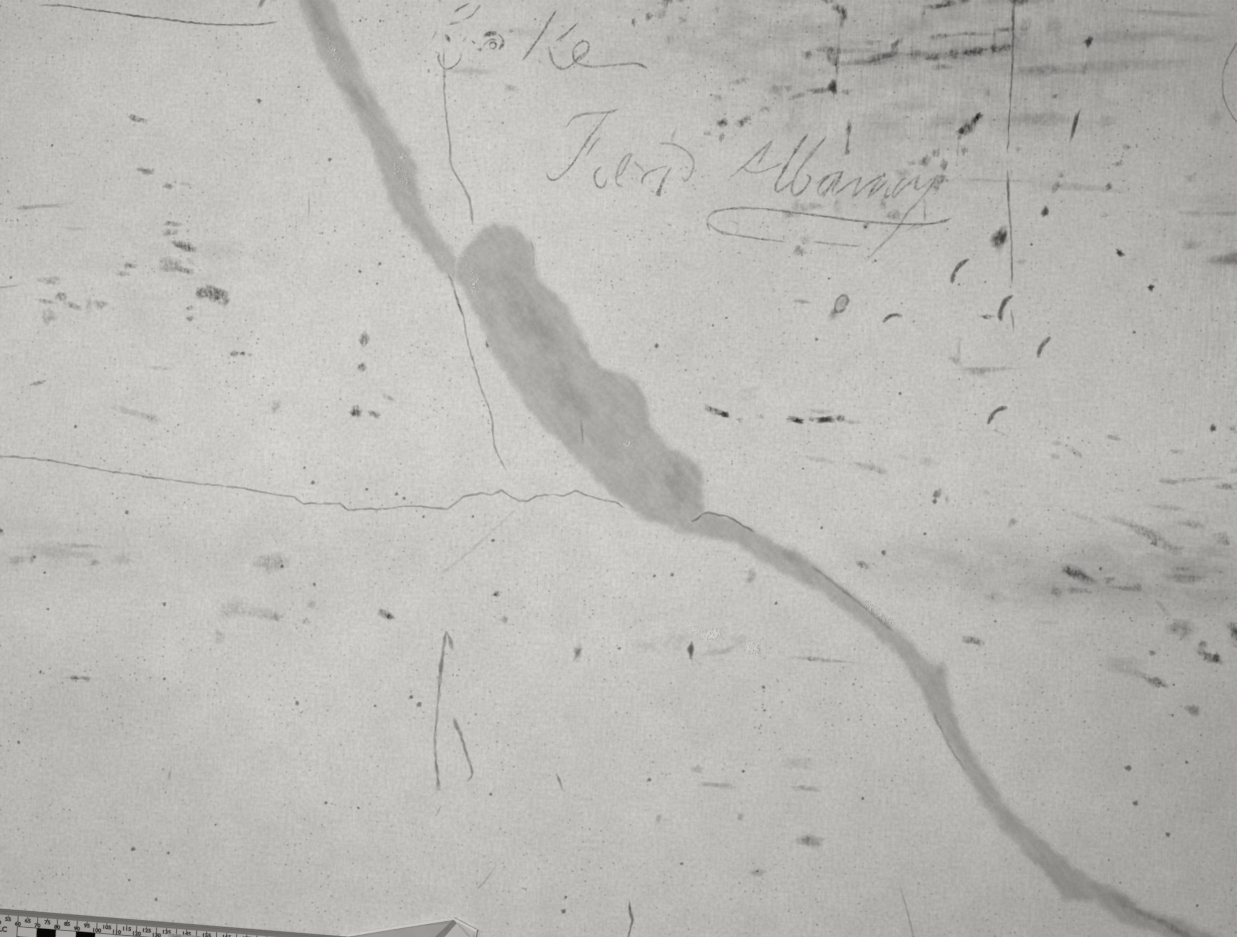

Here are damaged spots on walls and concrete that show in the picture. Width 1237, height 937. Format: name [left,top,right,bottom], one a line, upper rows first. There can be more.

crack [295,0,1223,937]